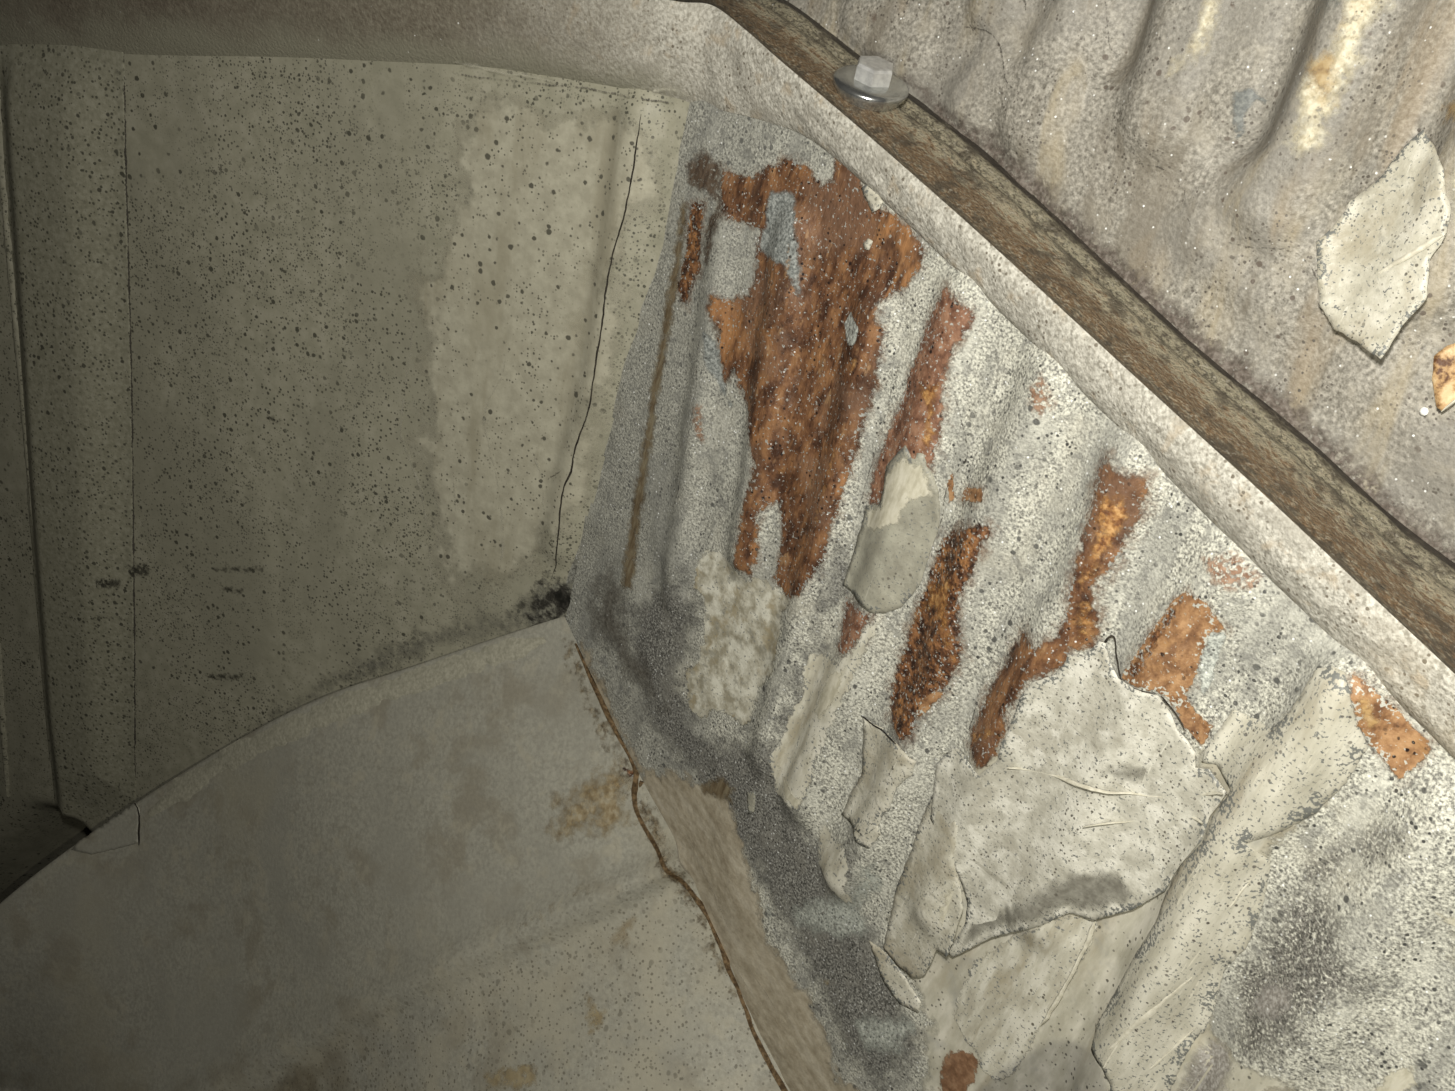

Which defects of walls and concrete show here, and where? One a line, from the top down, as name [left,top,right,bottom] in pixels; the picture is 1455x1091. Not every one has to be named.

crack [462,74,668,579]
corrosion [621,153,923,598]
corrosion [870,287,975,505]
peeling [1316,130,1451,359]
crack [575,643,788,1091]
corrosion [838,598,870,654]
corrosion [890,523,991,740]
peeling [626,445,1368,1091]
corrosion [970,457,1148,768]
corrosion [1122,592,1226,744]
corrosion [1350,672,1431,779]
corrosion [940,1050,978,1091]